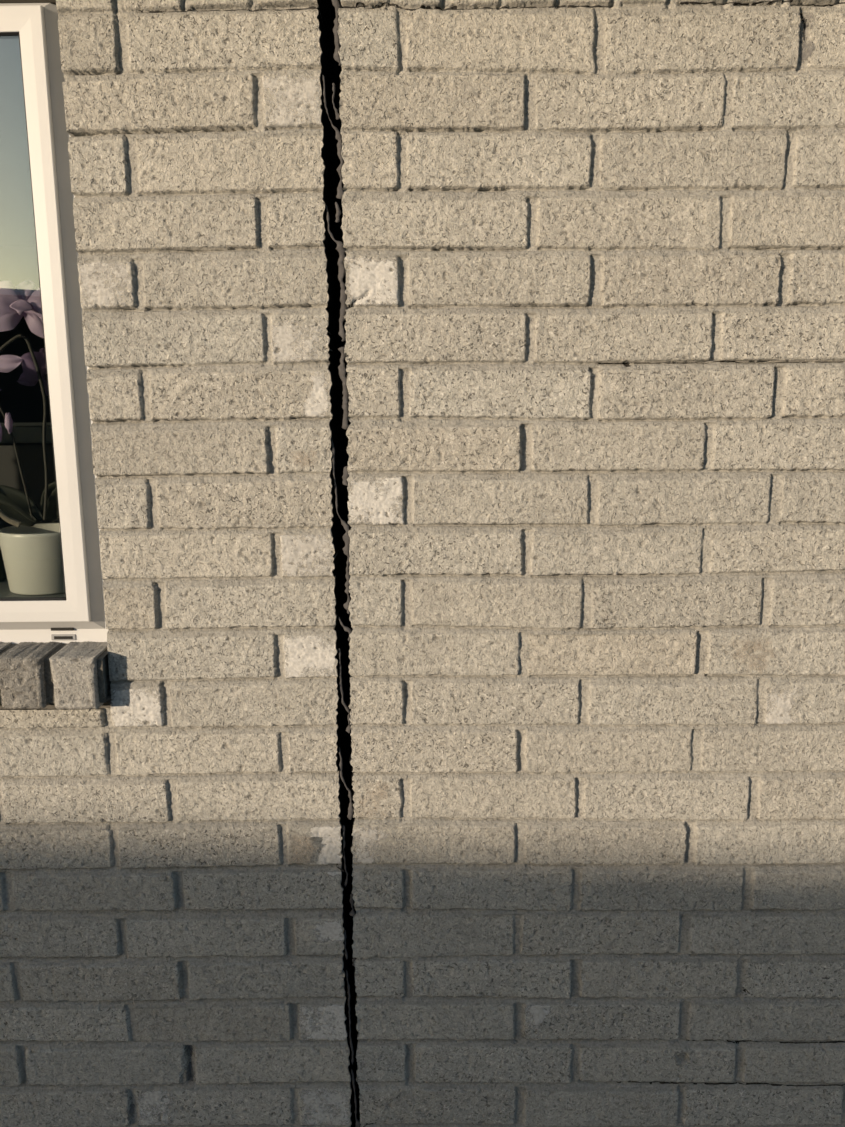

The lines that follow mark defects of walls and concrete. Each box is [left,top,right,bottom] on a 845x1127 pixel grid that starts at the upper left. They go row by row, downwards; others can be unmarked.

crack [139,0,613,1127]